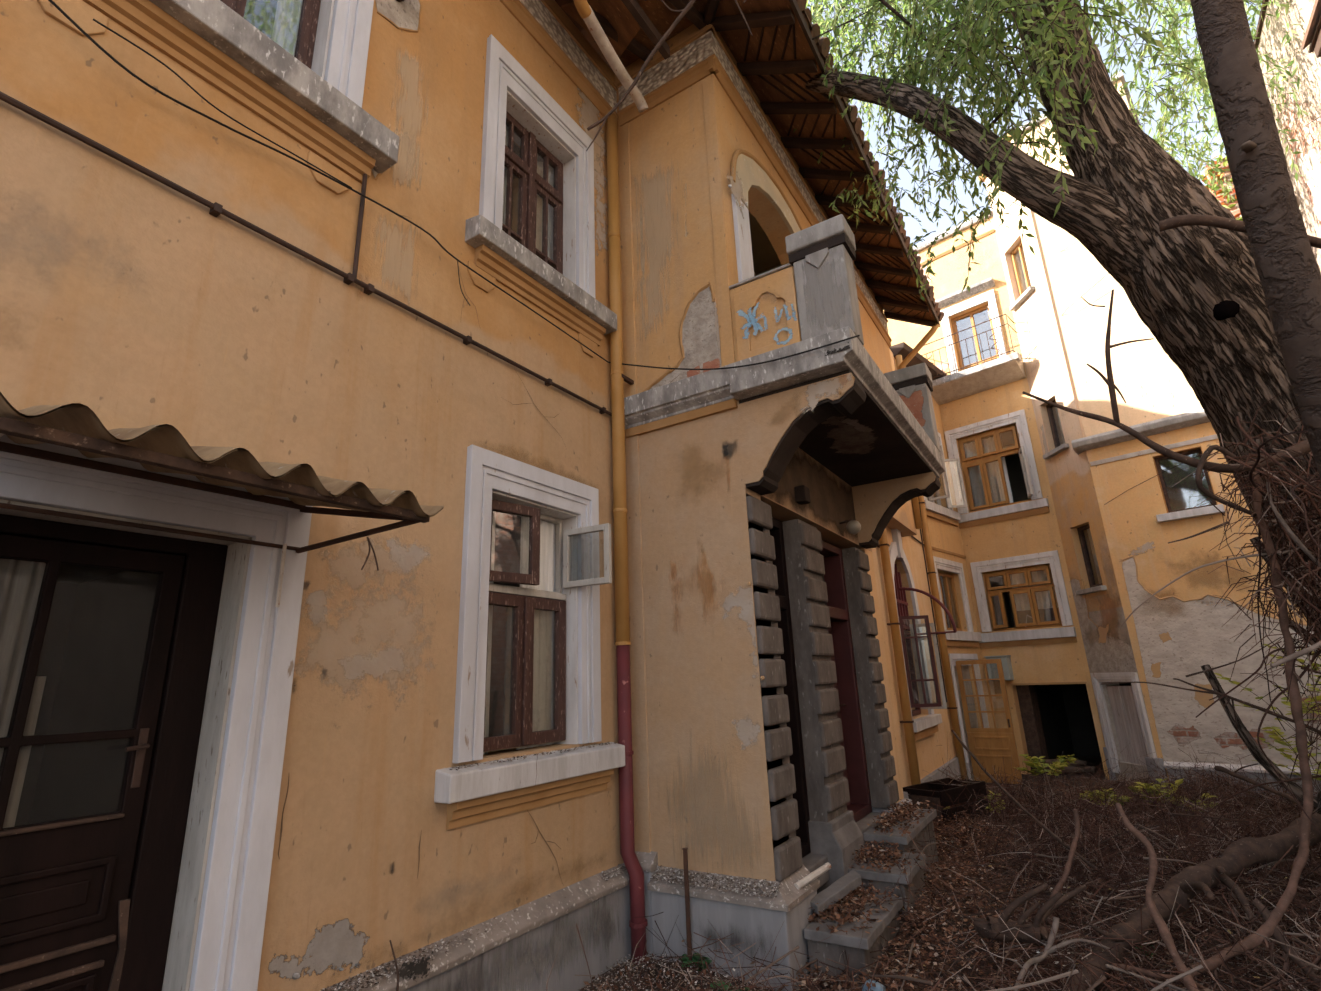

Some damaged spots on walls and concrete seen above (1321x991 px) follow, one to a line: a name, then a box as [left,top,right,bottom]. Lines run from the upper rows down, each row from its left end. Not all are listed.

spalling [643,281,721,392]
peeling [1070,542,1321,768]
flaking render [268,918,369,980]